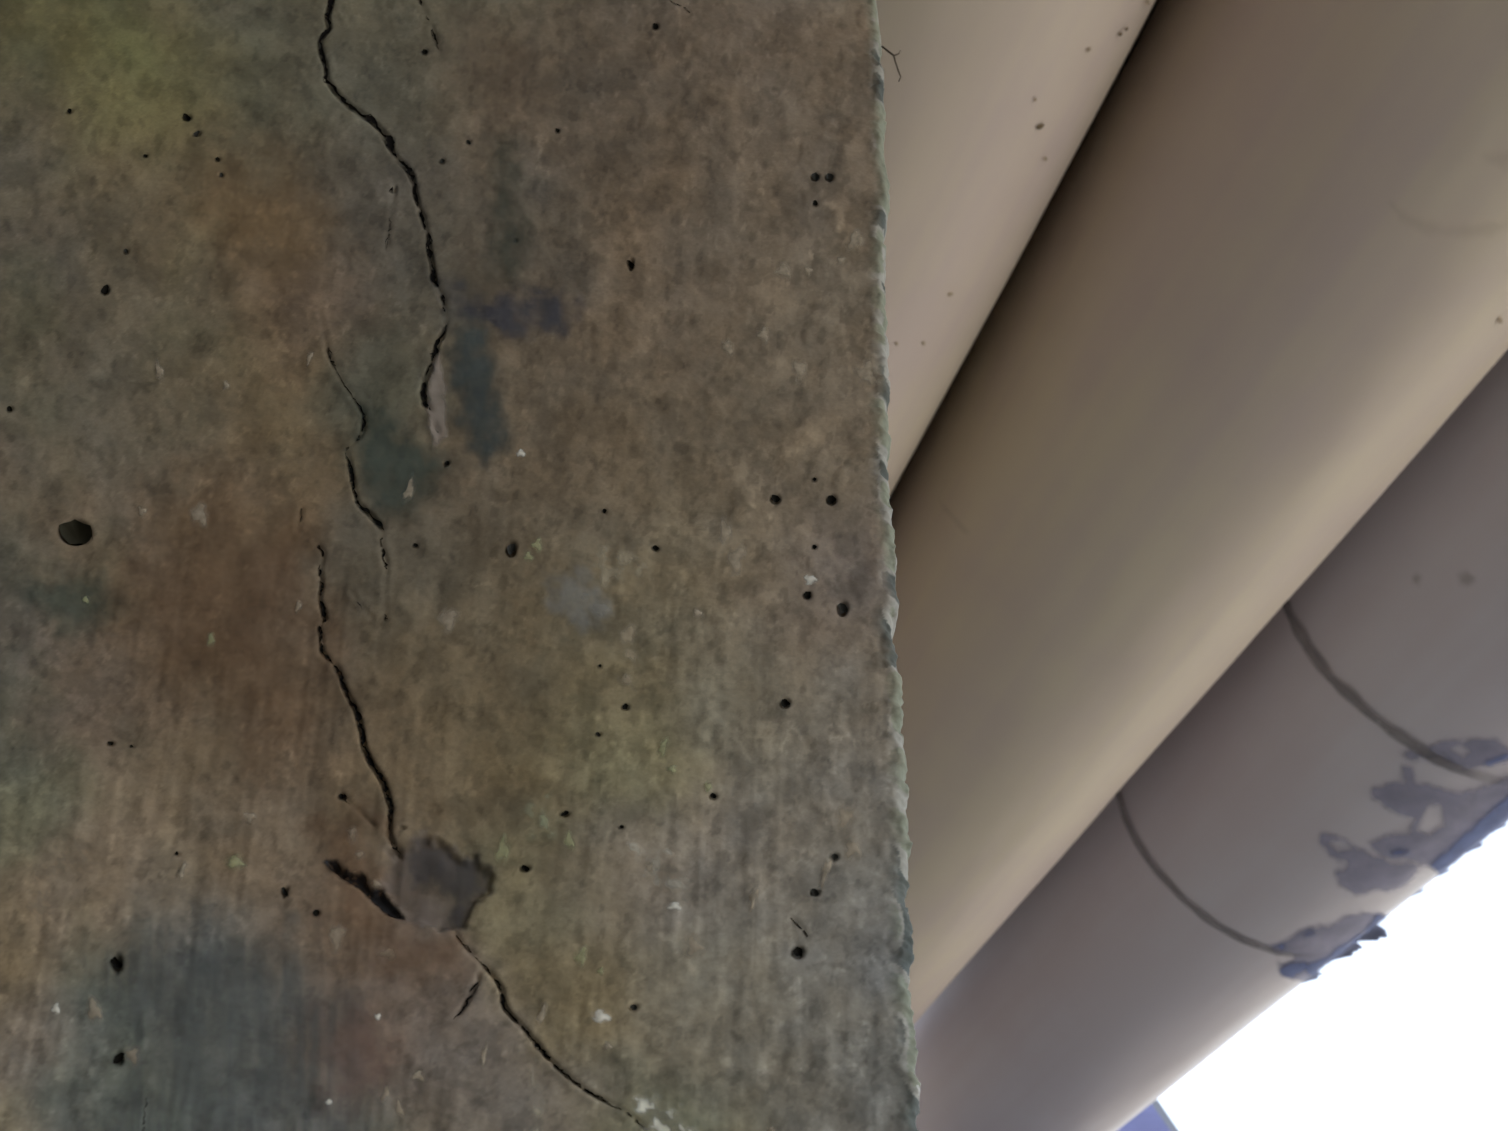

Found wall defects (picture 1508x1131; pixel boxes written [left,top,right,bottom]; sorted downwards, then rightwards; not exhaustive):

crack [319,0,447,433]
crack [328,348,388,569]
crack [300,508,401,855]
peeling [1320,740,1508,897]
crack [453,935,646,1130]
peeling [1273,914,1388,983]